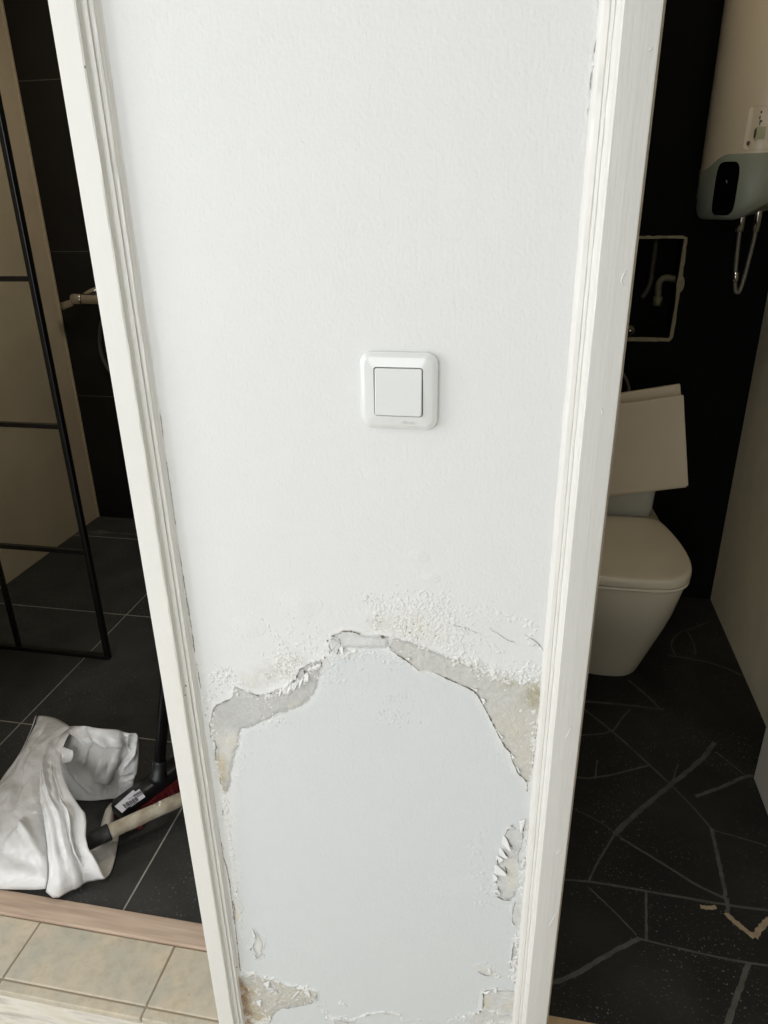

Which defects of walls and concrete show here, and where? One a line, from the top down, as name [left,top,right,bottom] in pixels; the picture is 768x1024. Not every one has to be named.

peeling [204,625,542,1024]